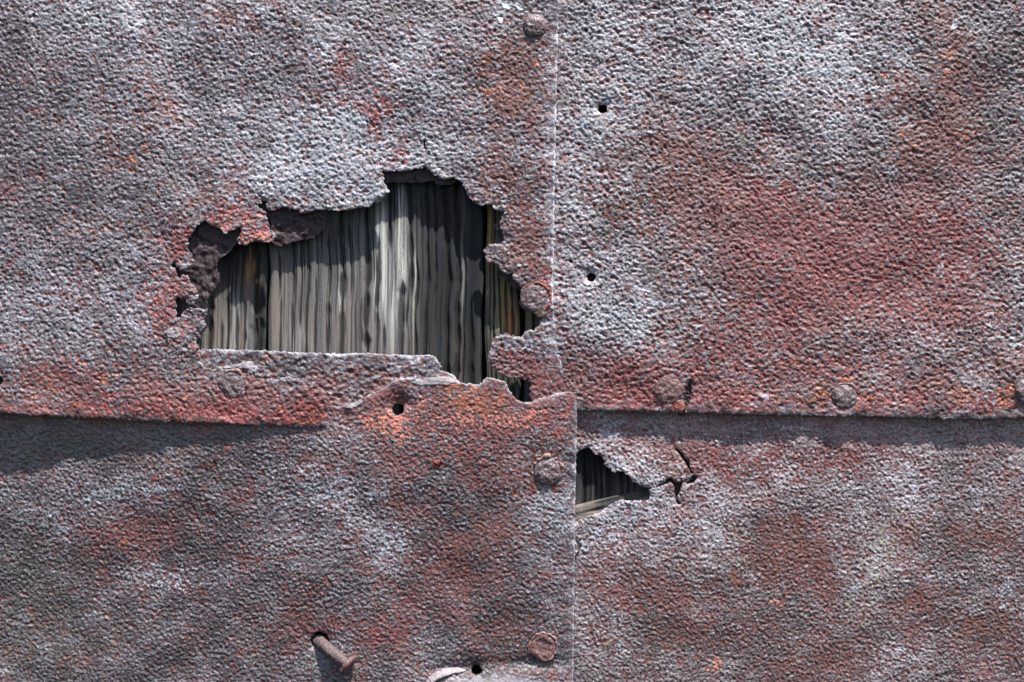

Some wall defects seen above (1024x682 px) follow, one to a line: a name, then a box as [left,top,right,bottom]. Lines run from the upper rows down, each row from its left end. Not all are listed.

rust [359,13,1024,612]
rust [0,348,326,426]
crack [646,448,697,504]
rust [469,605,543,666]
rust [874,586,1023,664]